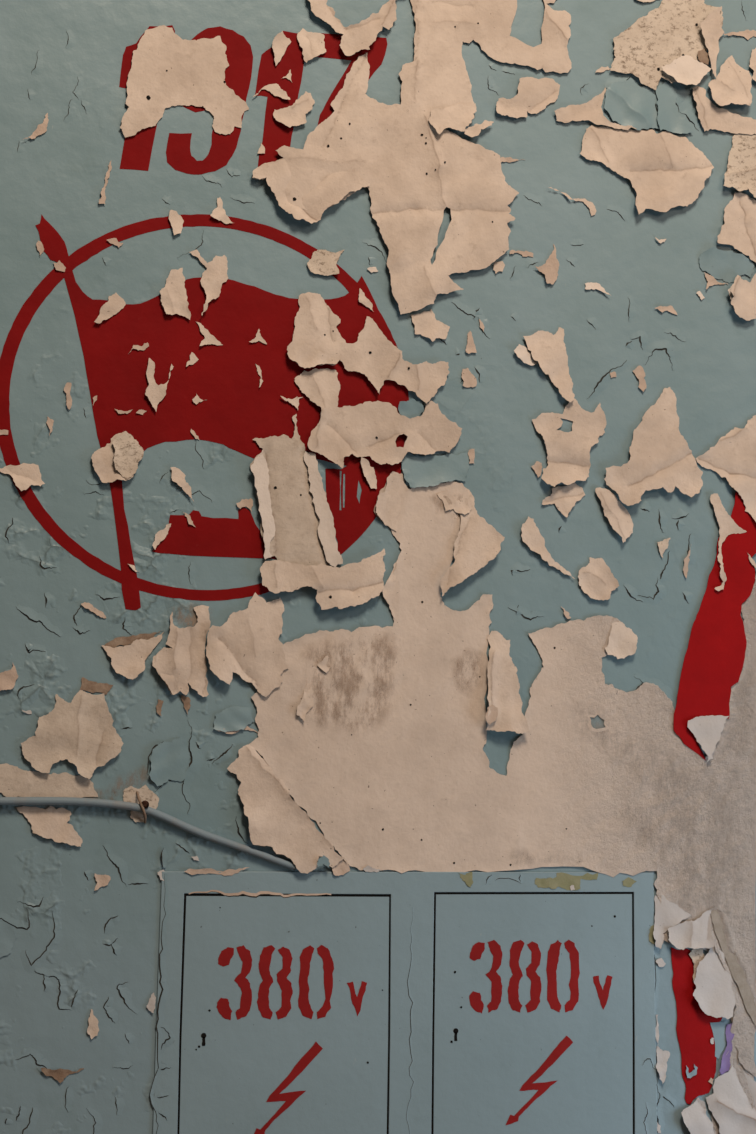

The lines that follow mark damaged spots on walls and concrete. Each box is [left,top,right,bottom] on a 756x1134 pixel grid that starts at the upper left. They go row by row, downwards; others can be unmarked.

peeling [115,250,228,415]
peeling [120,0,756,342]
flaking render [16,288,756,1134]
crack [0,718,331,1134]